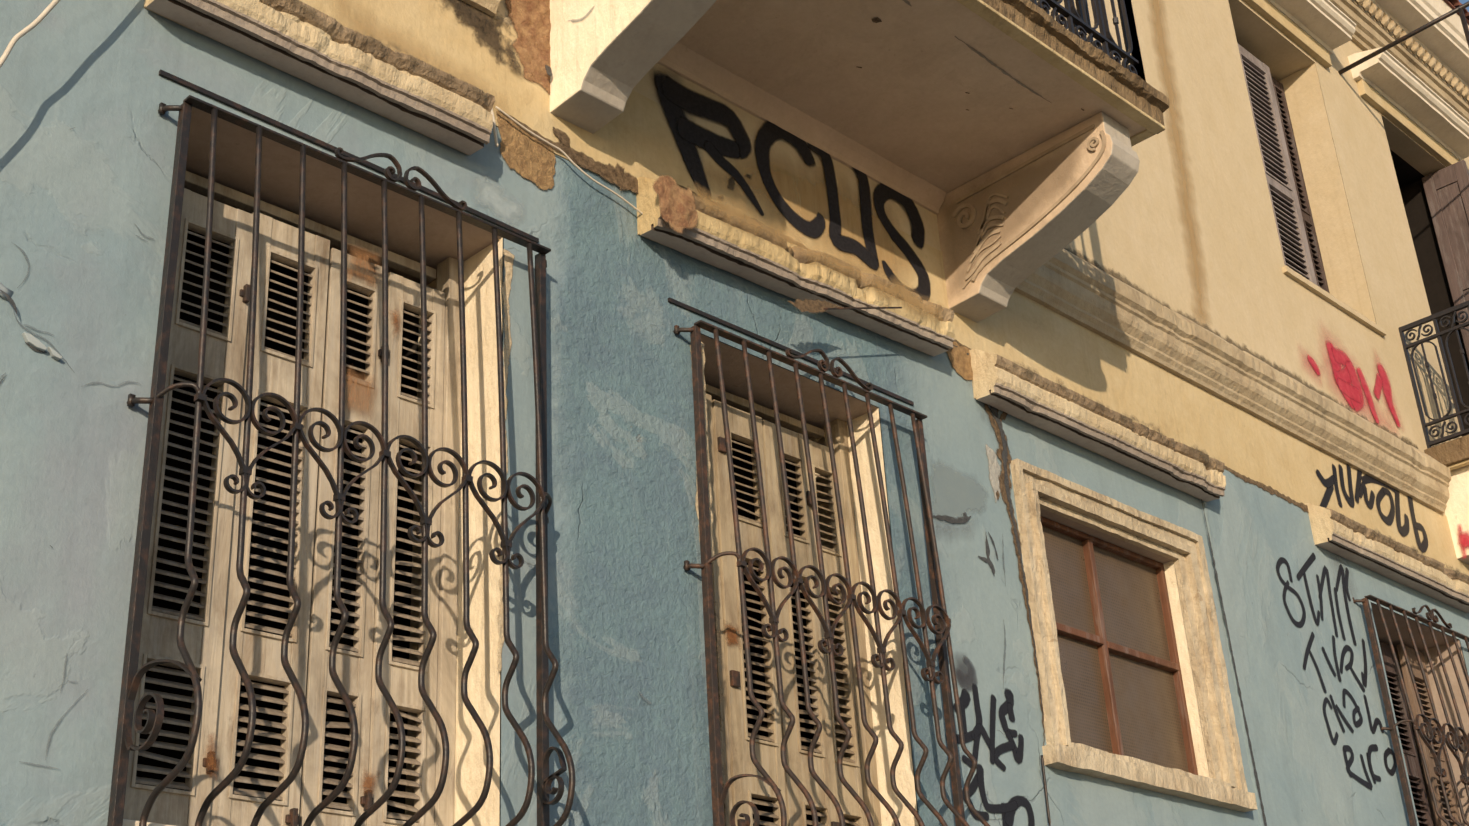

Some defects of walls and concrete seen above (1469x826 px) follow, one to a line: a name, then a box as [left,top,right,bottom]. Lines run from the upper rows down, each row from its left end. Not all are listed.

flaking render [505,0,552,94]
peeling [496,111,556,190]
peeling [479,182,521,223]
flaking render [653,175,698,233]
crack [13,243,137,387]